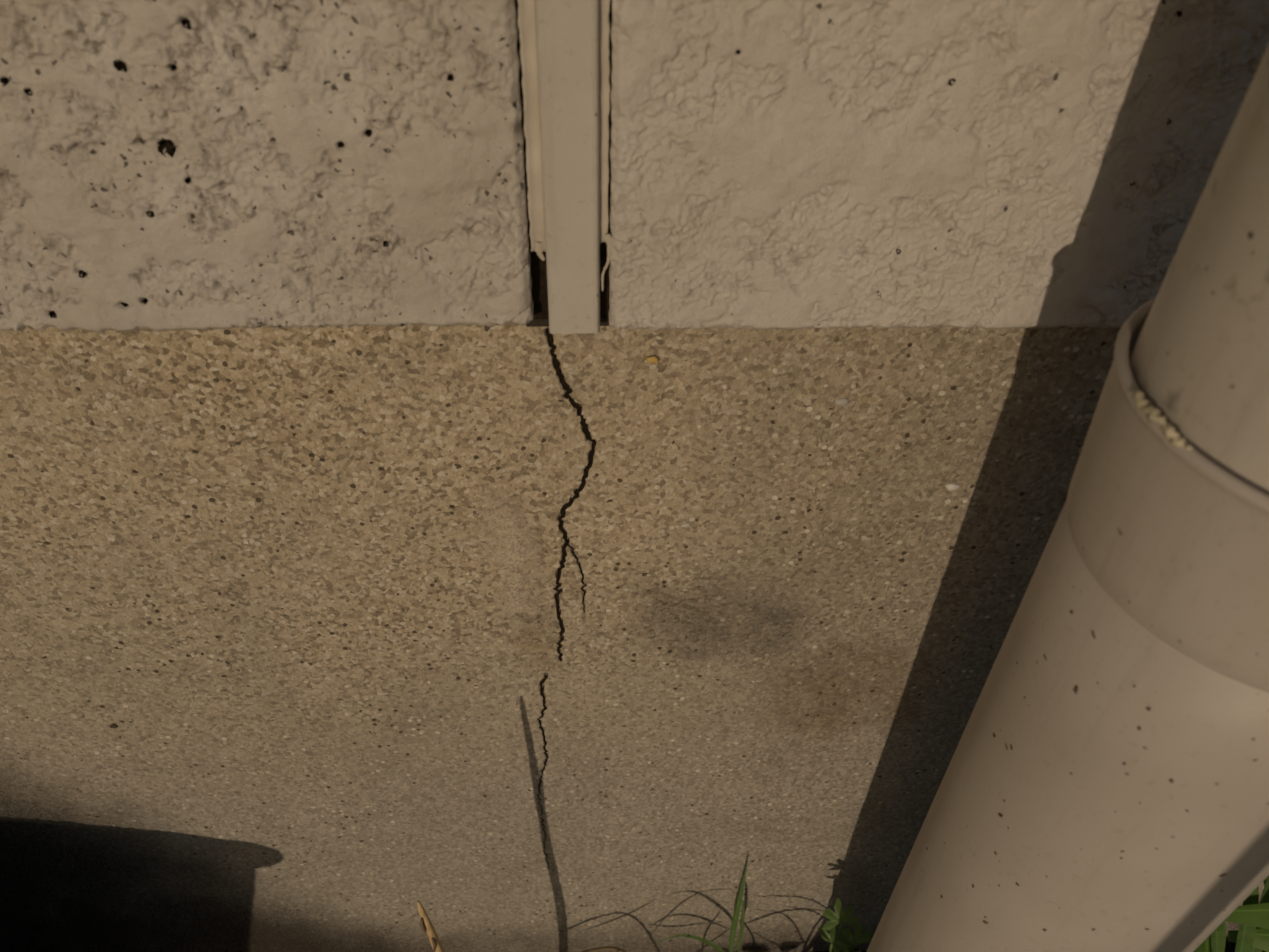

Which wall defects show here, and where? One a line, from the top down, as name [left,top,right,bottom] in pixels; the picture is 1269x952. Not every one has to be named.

crack [538,330,597,869]